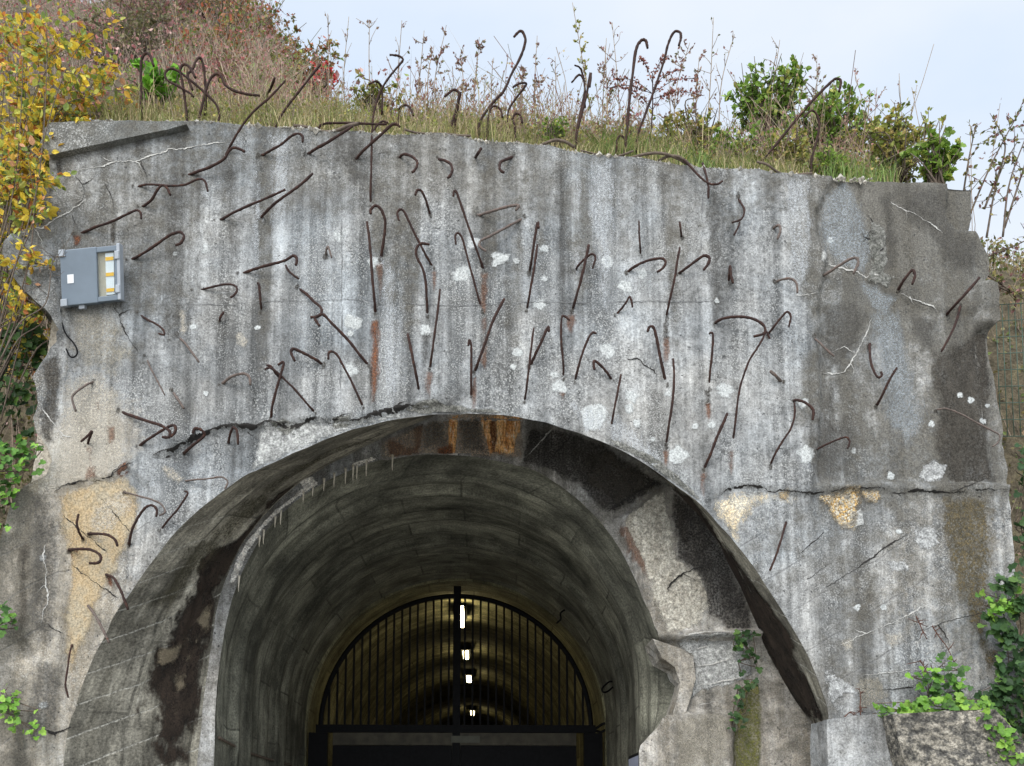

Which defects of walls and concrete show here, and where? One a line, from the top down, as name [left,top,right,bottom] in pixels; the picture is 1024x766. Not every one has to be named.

crack [34,142,224,249]
corrosion [369,321,380,400]
crack [113,212,816,458]
spalling [58,380,229,698]
corrosion [438,416,458,454]
corrosion [481,415,520,454]
damp [352,414,664,512]
spalling [819,484,880,529]
crack [721,475,1010,499]
damp [146,438,371,766]
spalling [625,493,752,699]
damp [671,487,822,723]